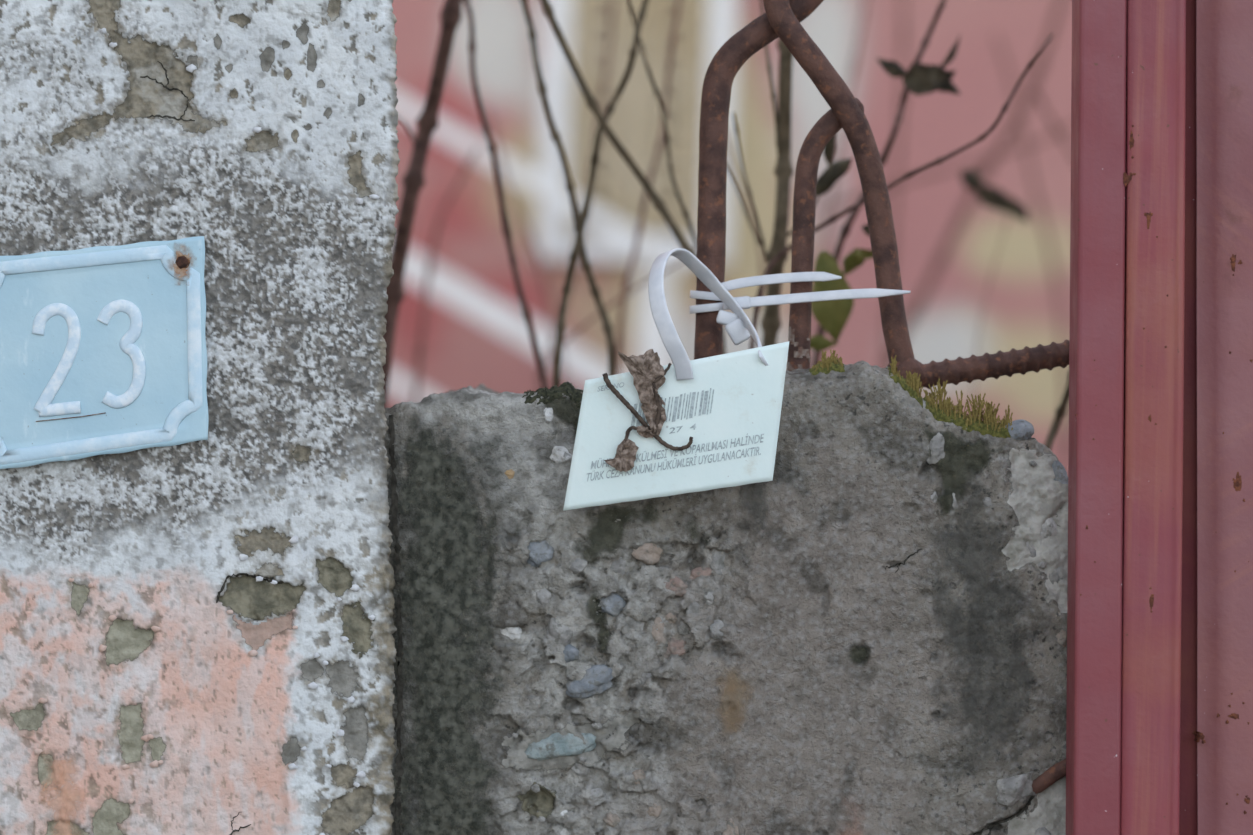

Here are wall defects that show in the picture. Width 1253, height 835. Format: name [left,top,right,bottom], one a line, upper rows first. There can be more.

spalling [50,0,227,146]
crack [140,61,195,121]
corrosion [1232,472,1245,502]
spalling [69,578,93,616]
spalling [99,615,161,666]
leakage [393,419,502,835]
leakage [936,487,1031,767]
spalling [219,527,375,835]
spalling [10,698,48,731]
spalling [117,703,167,770]
spalling [45,798,134,835]
crack [230,813,251,835]